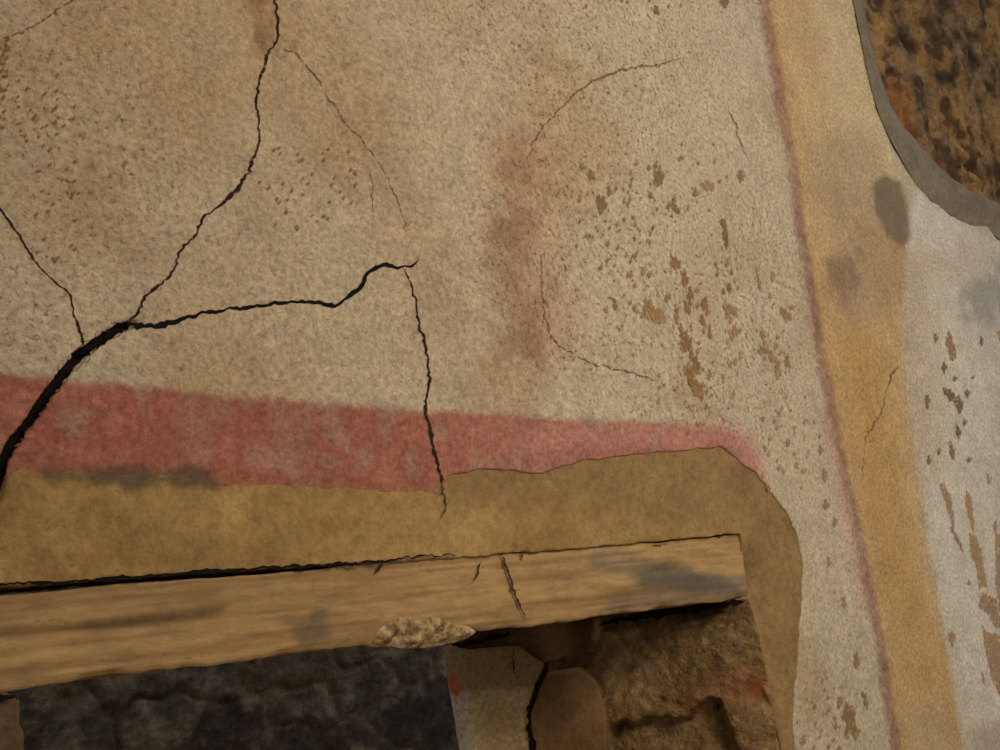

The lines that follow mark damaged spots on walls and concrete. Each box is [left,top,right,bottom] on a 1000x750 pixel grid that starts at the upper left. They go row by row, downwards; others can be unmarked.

flaking render [853,0,1000,239]
crack [0,0,447,519]
peeling [576,161,744,410]
peeling [756,266,797,389]
peeling [762,394,823,474]
peeling [927,331,970,465]
crack [0,694,17,702]
crack [0,553,456,586]
crack [453,552,546,750]
peeling [800,677,869,750]
peeling [941,483,1000,693]